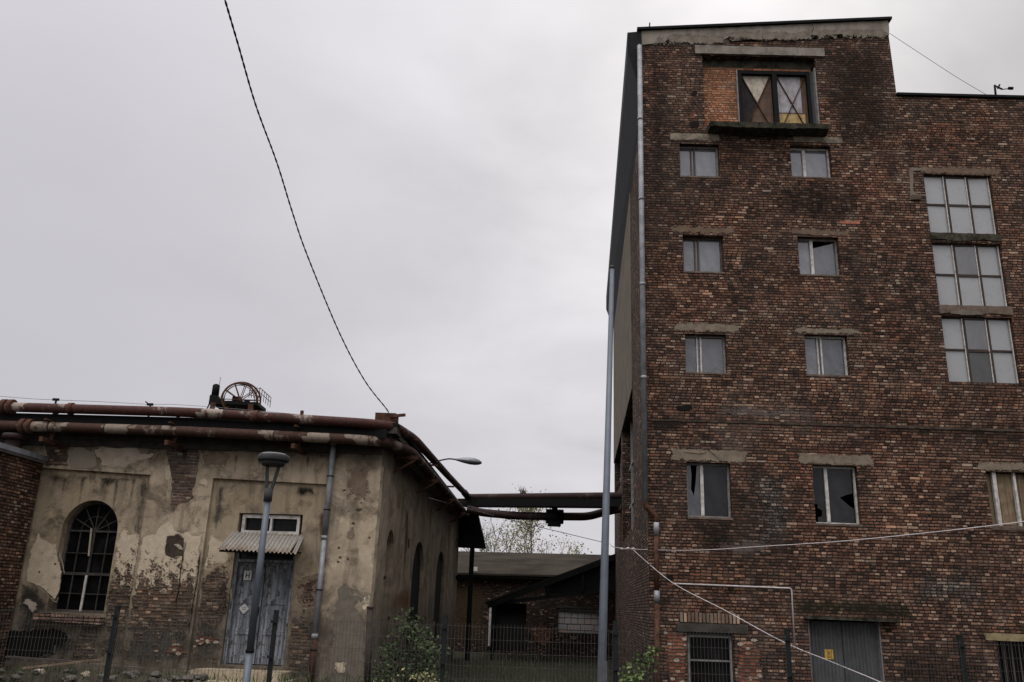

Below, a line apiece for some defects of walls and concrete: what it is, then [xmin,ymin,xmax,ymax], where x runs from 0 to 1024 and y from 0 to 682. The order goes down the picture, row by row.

peeling [4,446,233,666]
peeling [285,573,318,677]